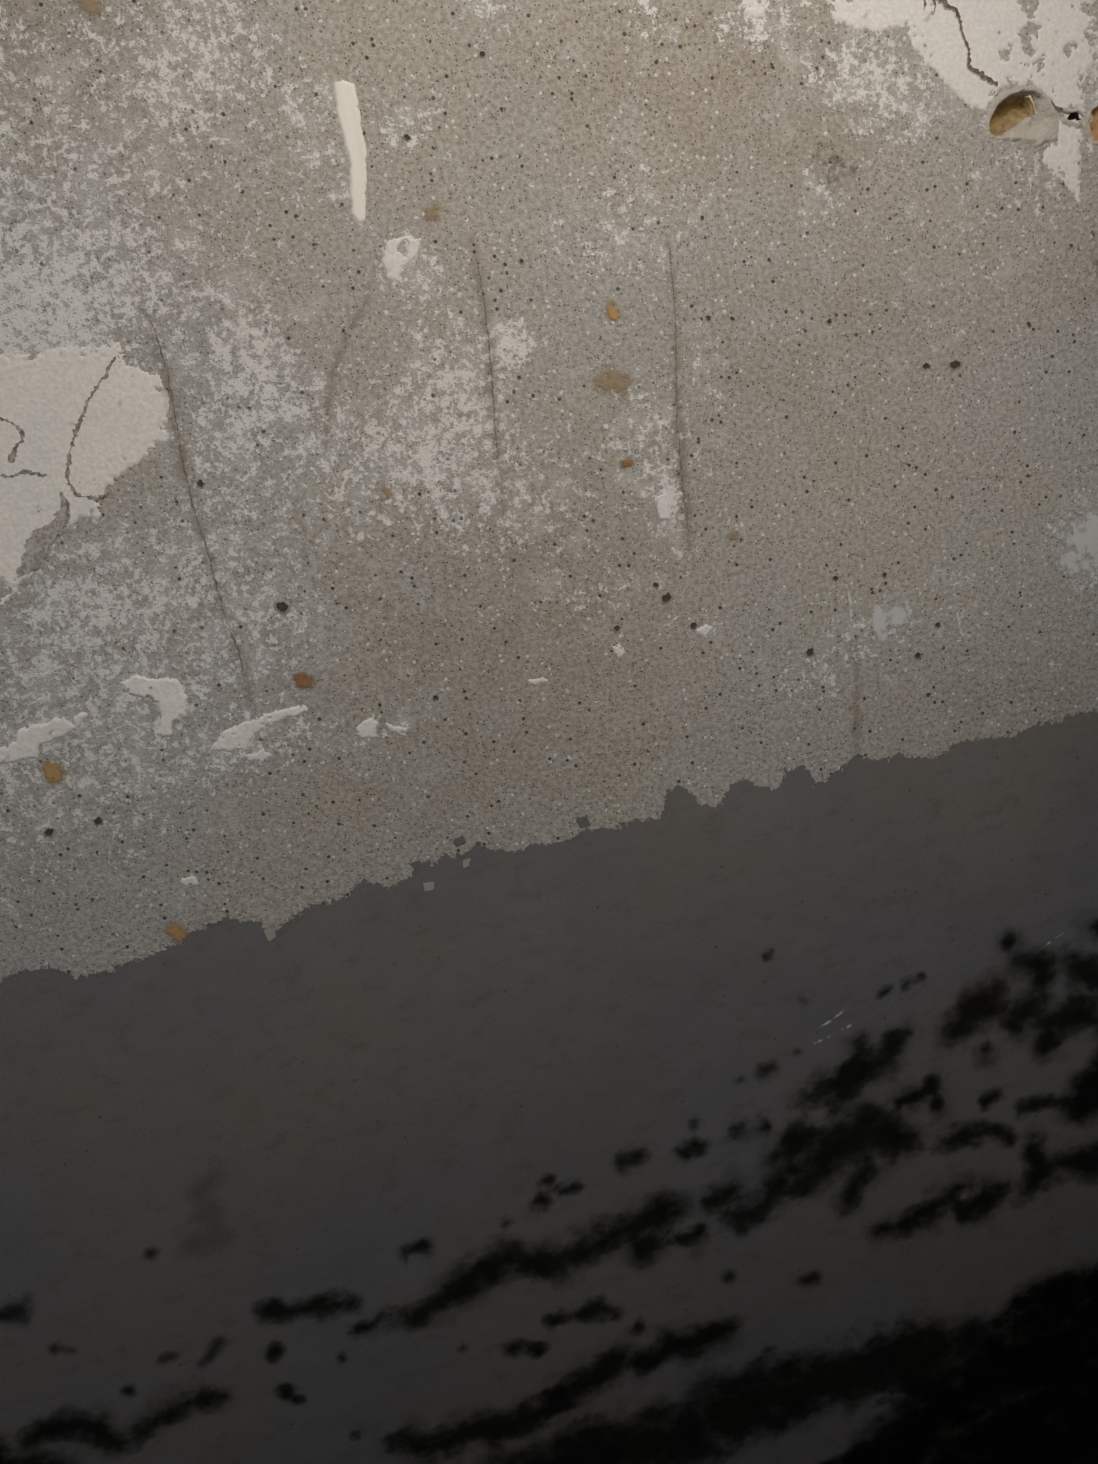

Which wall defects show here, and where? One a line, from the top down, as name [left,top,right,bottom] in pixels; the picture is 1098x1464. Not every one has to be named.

flaking render [738,0,770,19]
crack [923,0,998,86]
flaking render [802,0,1098,203]
crack [1051,100,1063,113]
flaking render [0,341,170,606]
flaking render [120,675,188,737]
flaking render [0,712,88,764]